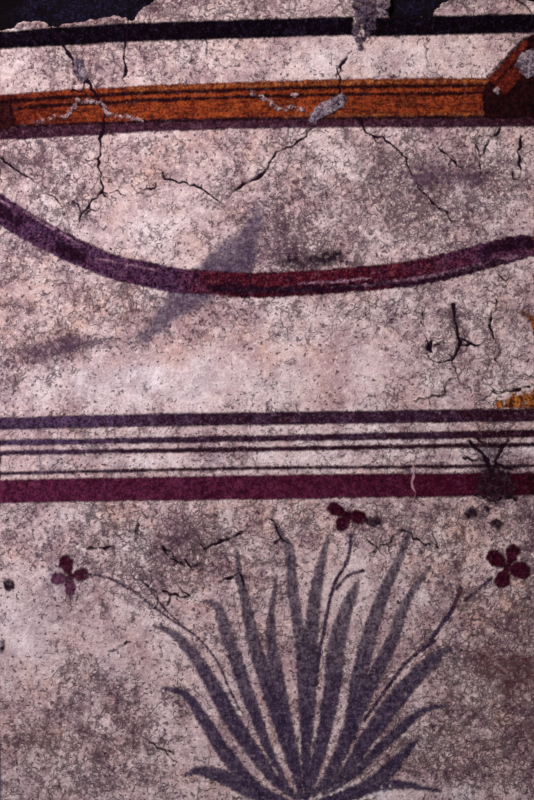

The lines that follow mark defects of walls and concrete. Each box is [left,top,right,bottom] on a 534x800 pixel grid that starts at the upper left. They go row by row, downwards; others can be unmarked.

flaking render [0,0,154,31]
flaking render [351,0,449,50]
crack [333,50,352,94]
spalling [516,49,534,78]
crack [0,19,312,222]
spalling [250,91,347,123]
crack [355,117,501,221]
crack [511,134,524,180]
crack [414,298,500,404]
crack [483,373,534,400]
crack [463,431,515,486]
crack [361,528,438,557]